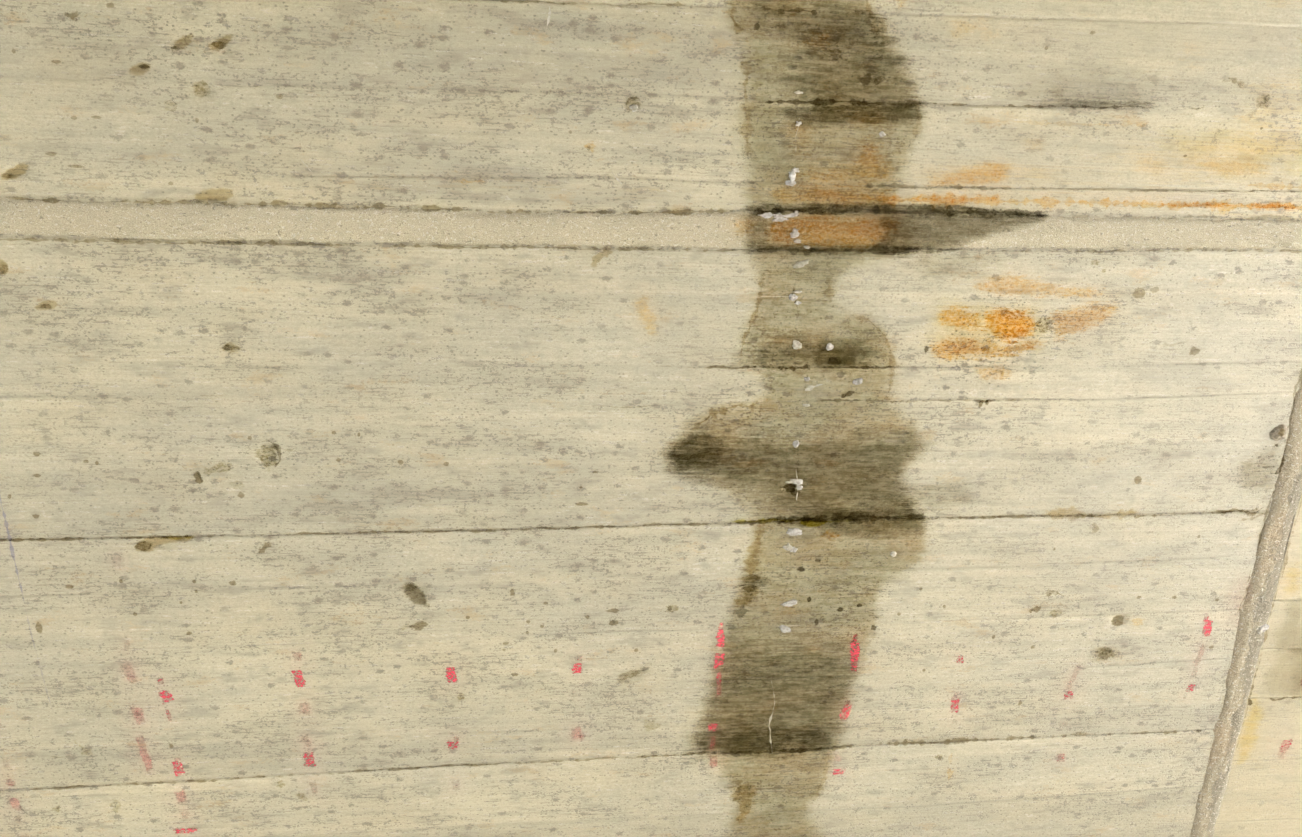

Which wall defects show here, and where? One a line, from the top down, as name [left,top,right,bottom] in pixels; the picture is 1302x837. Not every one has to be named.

water stain [785,167,799,186]
water stain [760,205,852,268]
water stain [870,205,1043,250]
water stain [783,528,803,553]